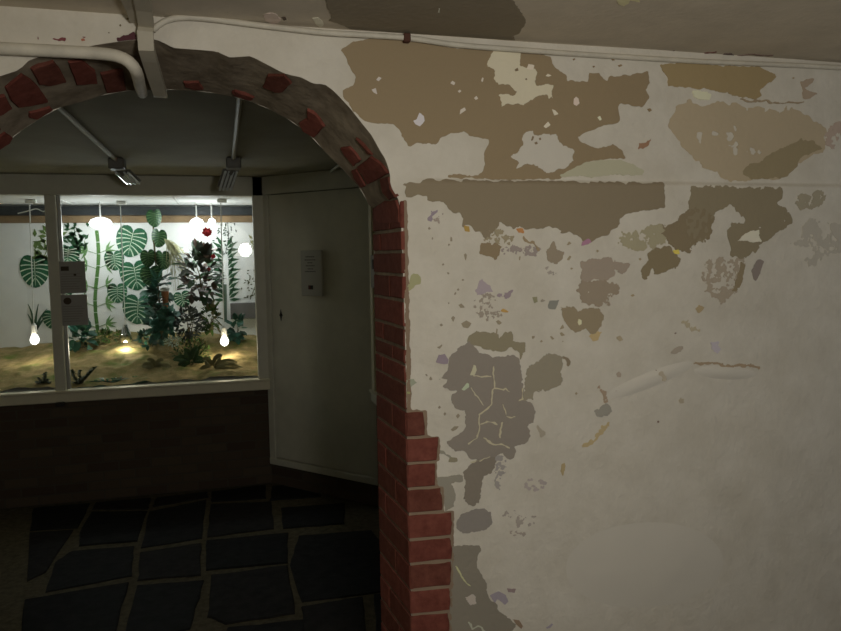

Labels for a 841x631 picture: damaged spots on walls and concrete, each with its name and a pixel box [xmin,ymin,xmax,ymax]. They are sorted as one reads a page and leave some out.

peeling [325,0,793,537]
crack [468,366,523,463]
peeling [449,545,523,631]